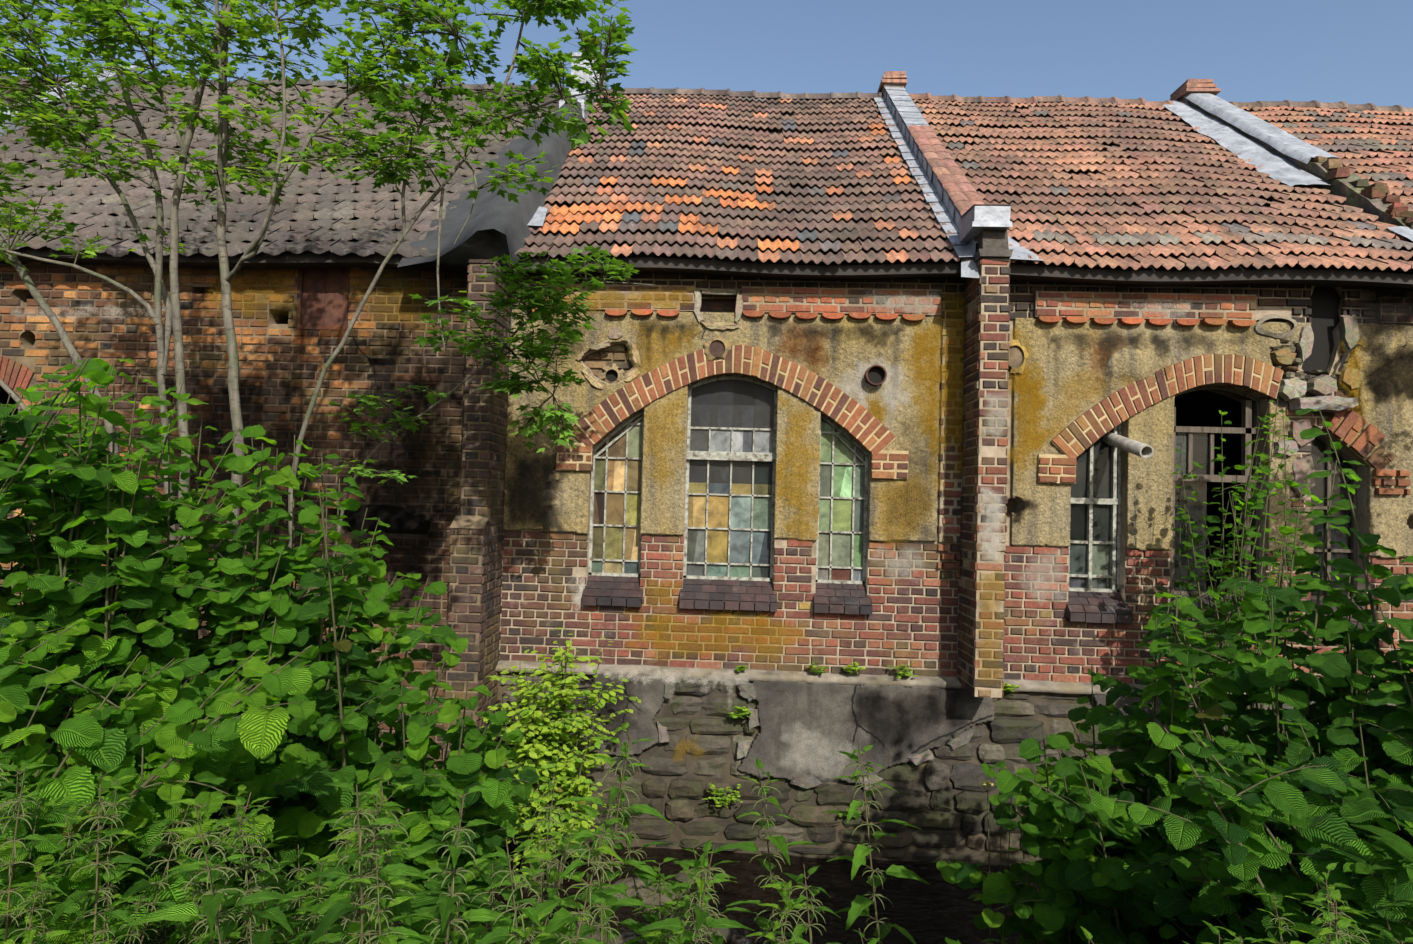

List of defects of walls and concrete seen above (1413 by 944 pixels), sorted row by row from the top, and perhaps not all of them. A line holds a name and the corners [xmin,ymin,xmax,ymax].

spalling [575,327,641,391]
peeling [1296,324,1314,366]
peeling [1339,314,1361,391]
peeling [1289,419,1316,497]
water stain [507,455,560,529]
flaking render [657,721,670,743]
flaking render [736,683,760,760]
flaking render [907,729,975,766]
flaking render [790,775,822,789]
flaking render [856,774,883,791]